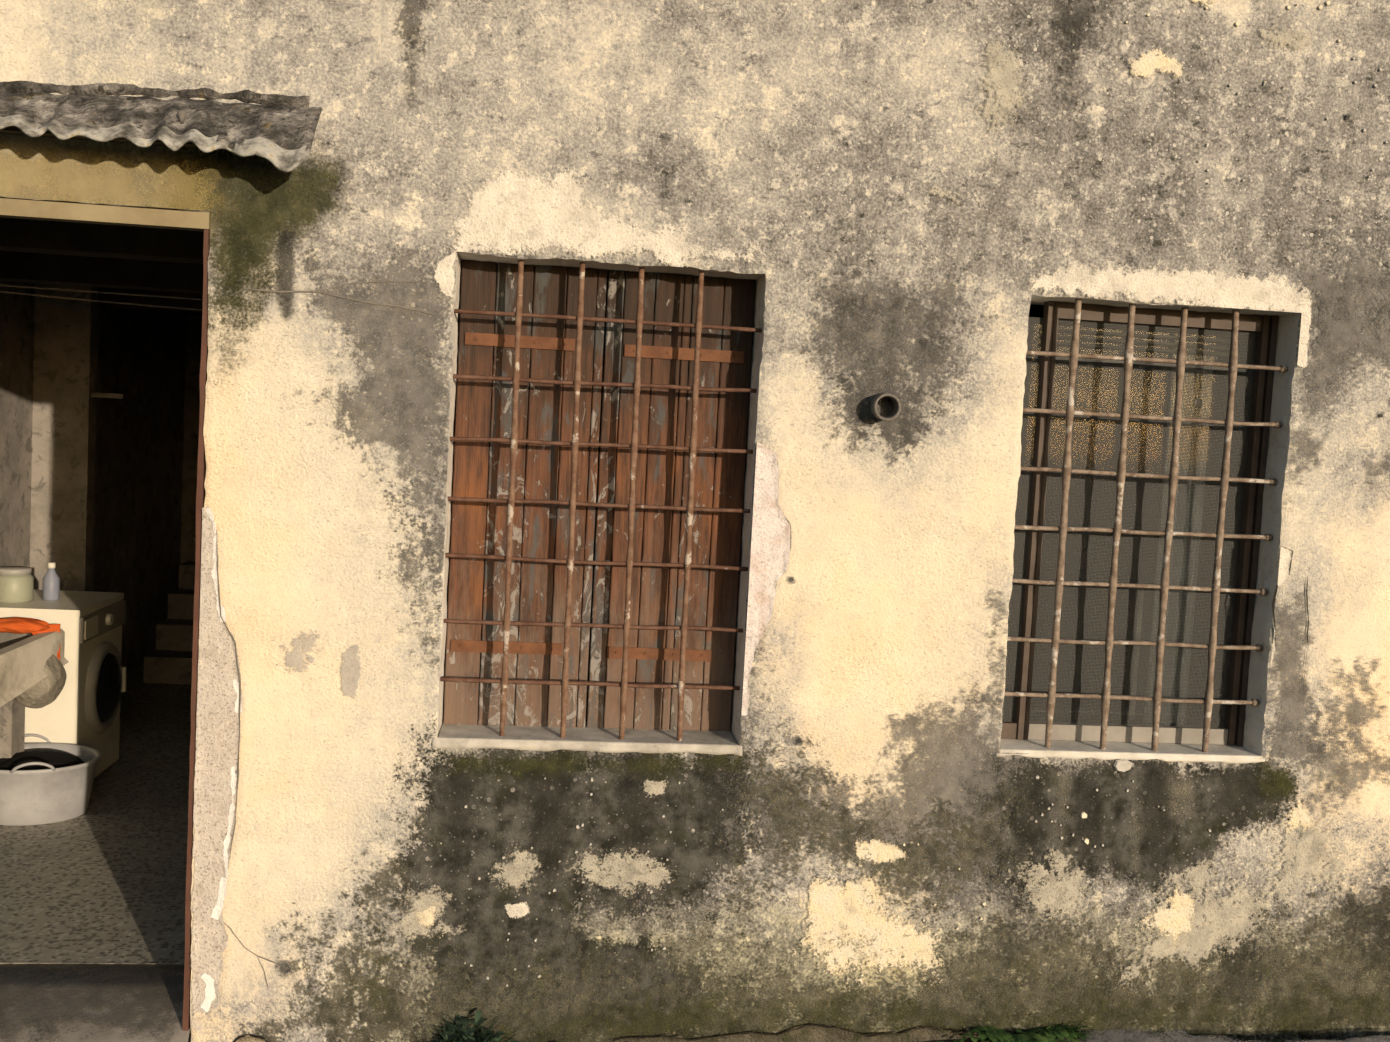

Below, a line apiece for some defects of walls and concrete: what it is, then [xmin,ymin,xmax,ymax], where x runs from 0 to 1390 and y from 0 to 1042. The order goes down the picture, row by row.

peeling [1129,49,1183,79]
peeling [1259,25,1313,49]
water stain [0,150,215,211]
water stain [210,219,455,669]
peeling [742,443,796,716]
peeling [190,507,242,1013]
peeling [644,780,666,798]
water stain [242,590,1390,1042]
peeling [491,850,542,918]
peeling [569,848,673,897]
peeling [792,838,944,987]